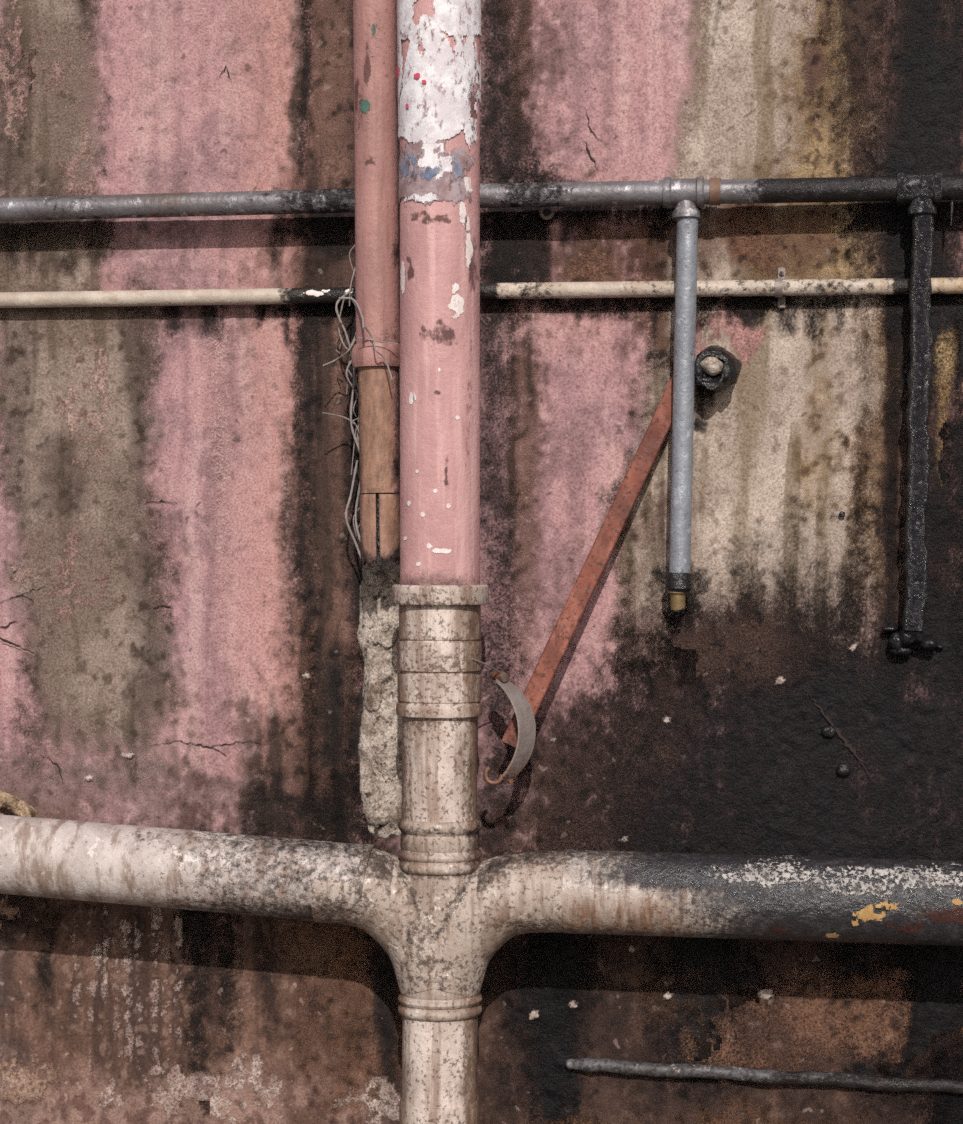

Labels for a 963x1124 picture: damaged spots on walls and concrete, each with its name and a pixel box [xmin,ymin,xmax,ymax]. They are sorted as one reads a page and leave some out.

leakage [0,0,104,197]
leakage [0,218,116,292]
leakage [271,212,355,288]
crack [0,585,46,656]
leakage [0,305,231,792]
leakage [239,303,395,853]
leakage [694,295,910,647]
spalling [0,787,38,817]
spalling [0,894,20,930]
spalling [0,1054,59,1105]
leakage [73,907,292,1124]
leakage [504,932,596,1124]